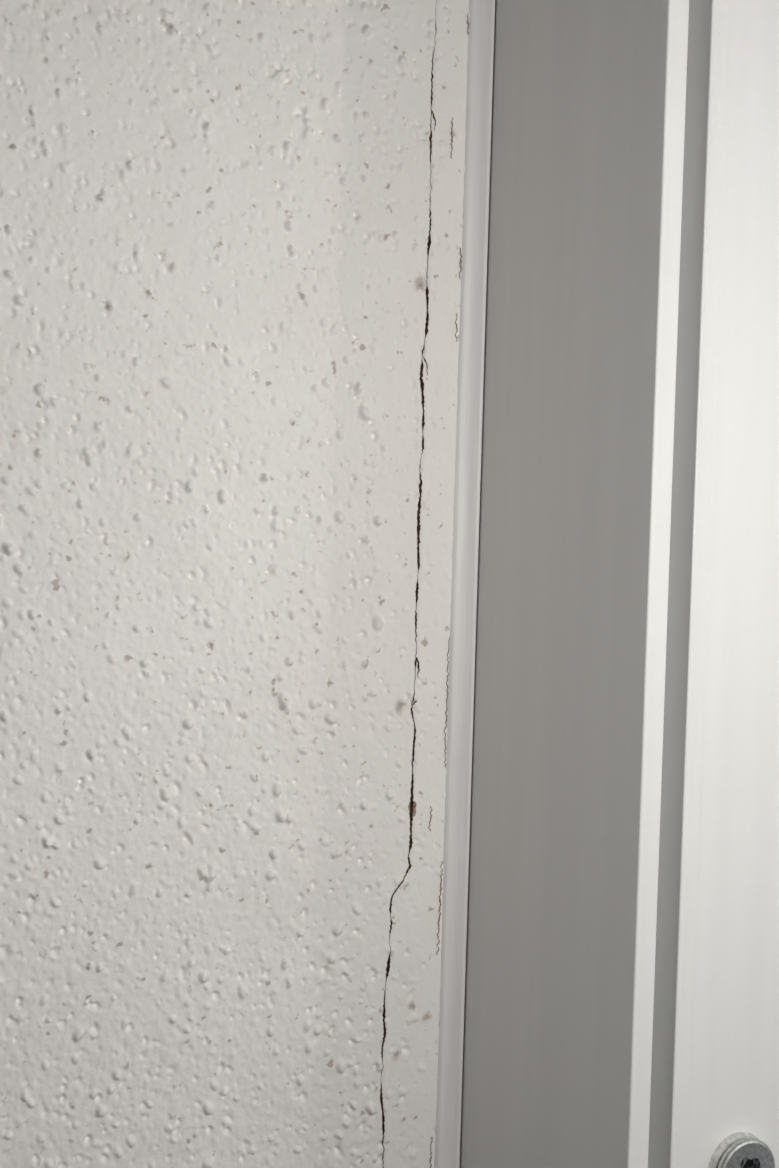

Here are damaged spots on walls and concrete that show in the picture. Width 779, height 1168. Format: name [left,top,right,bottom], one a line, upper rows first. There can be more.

crack [380,0,458,1168]